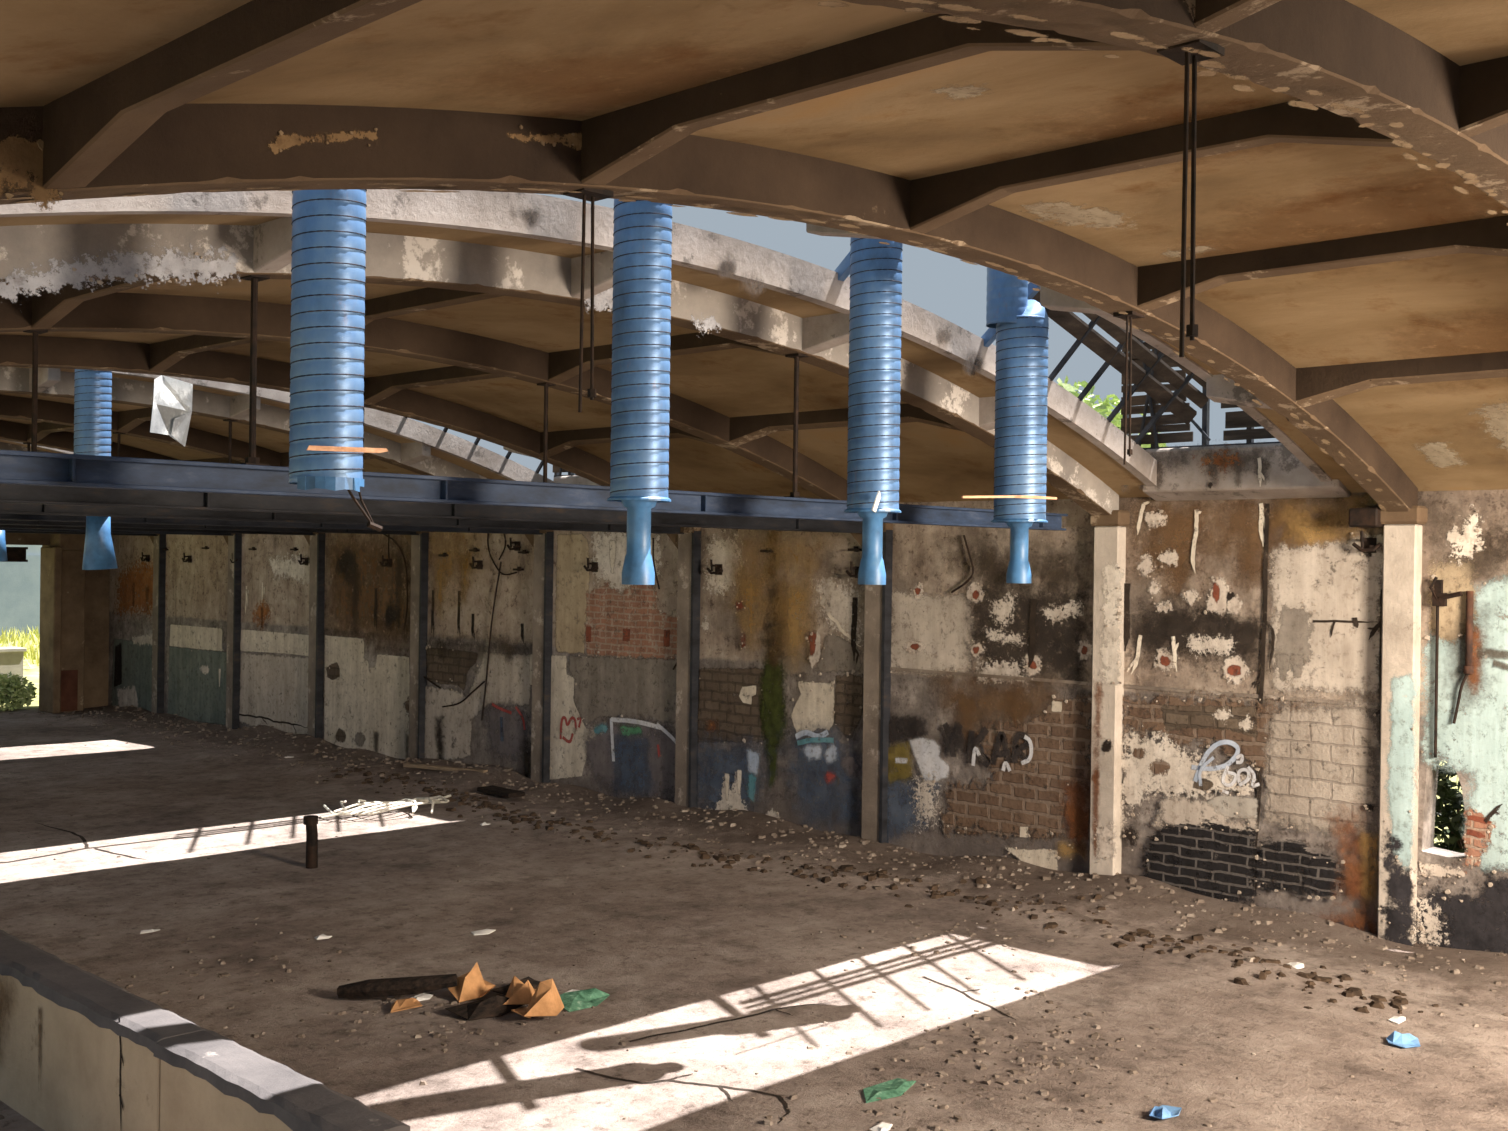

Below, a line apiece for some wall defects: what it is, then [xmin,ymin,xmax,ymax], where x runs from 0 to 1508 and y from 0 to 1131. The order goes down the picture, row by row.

spalling [898,0,984,30]
spalling [1005,14,1072,43]
peeling [0,134,64,211]
spalling [1103,32,1508,225]
peeling [0,241,242,303]
spalling [1119,311,1262,406]
spalling [1290,413,1387,511]
peeling [266,551,310,586]
damp [739,531,819,666]
peeling [111,633,152,711]
peeling [170,624,531,760]
spalling [890,504,1508,954]